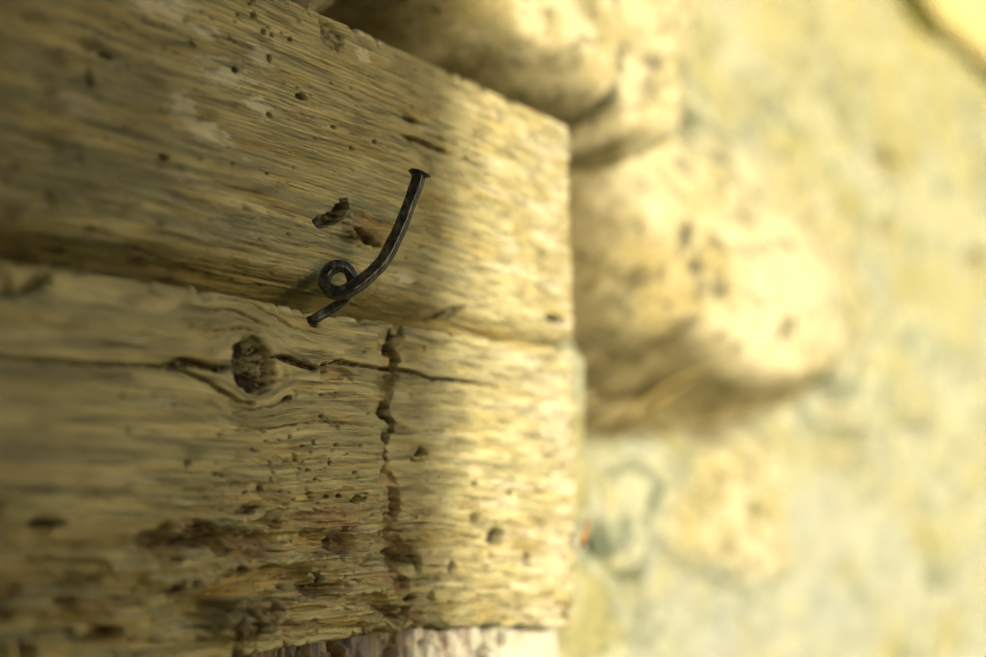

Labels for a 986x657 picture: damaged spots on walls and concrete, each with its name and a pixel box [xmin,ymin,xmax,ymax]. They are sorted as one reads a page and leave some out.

crack [266,353,500,390]
crack [299,569,327,589]